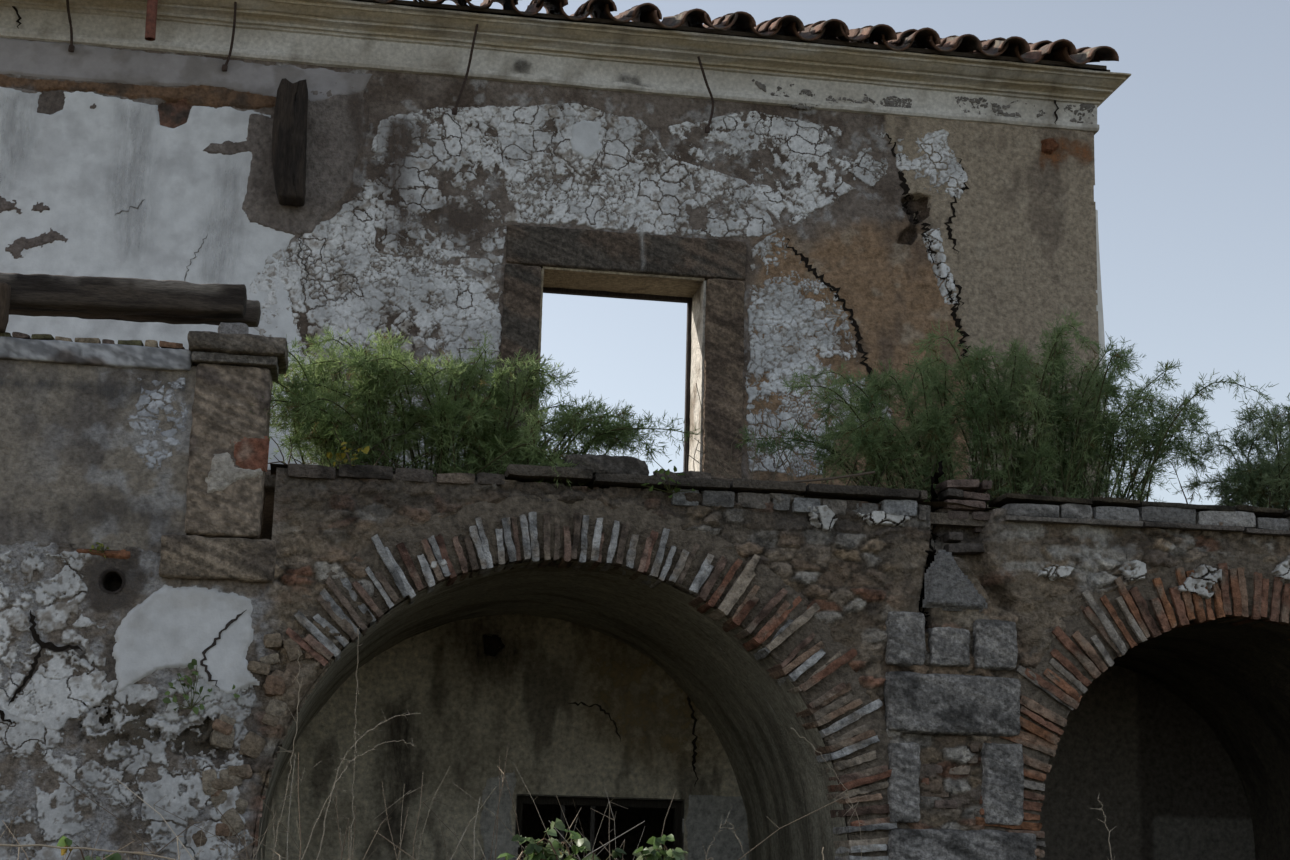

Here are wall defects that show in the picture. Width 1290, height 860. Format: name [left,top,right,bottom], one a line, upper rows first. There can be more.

peeling [955,96,1045,118]
peeling [1064,103,1095,124]
peeling [0,74,968,478]
crack [782,238,885,409]
crack [886,133,971,389]
crack [0,610,83,727]
peeling [0,548,257,860]
crack [200,610,246,688]